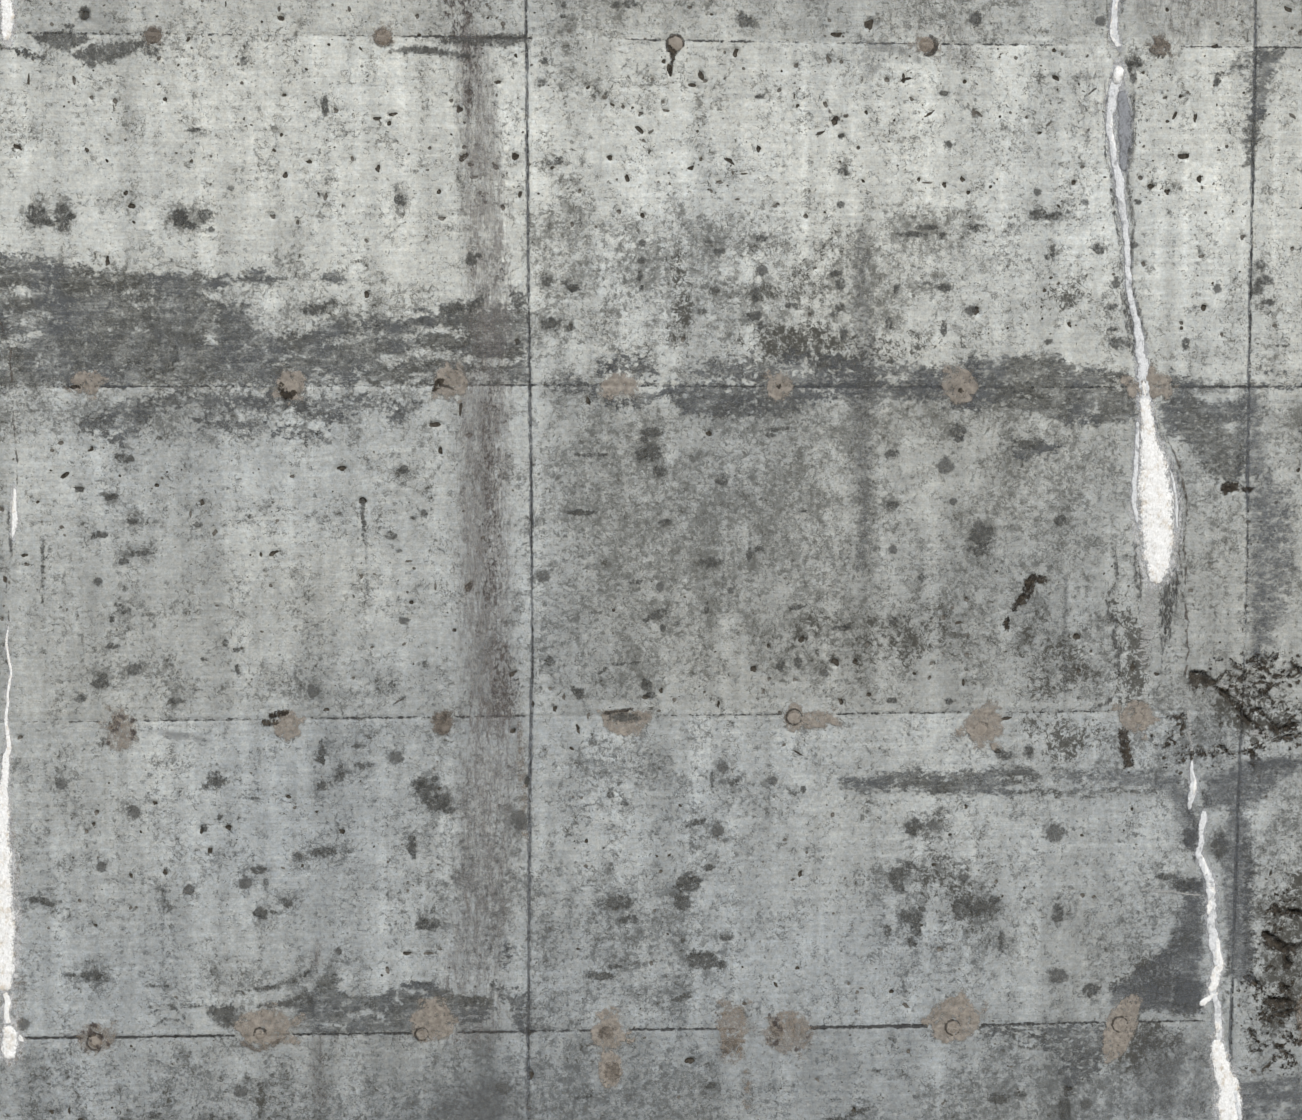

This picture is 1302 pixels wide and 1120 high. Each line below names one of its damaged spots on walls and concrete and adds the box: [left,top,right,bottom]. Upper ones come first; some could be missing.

water stain [0,0,1302,667]
water stain [776,657,802,672]
water stain [838,726,1302,1120]